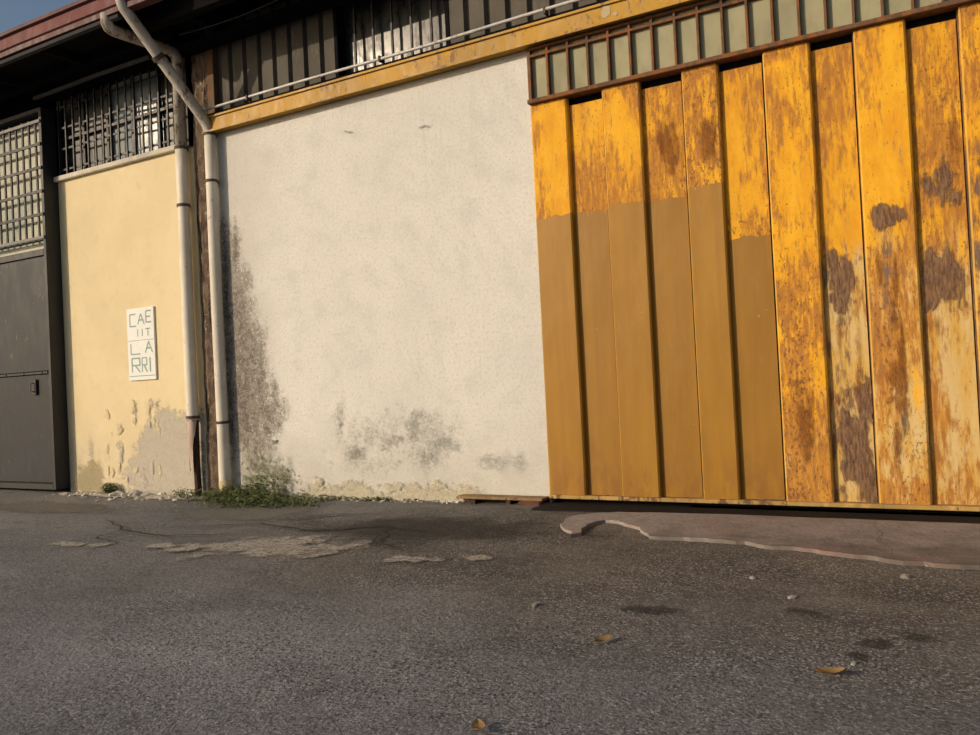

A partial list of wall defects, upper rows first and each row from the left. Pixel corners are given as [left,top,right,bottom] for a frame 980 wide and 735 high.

corrosion [657,122,677,172]
corrosion [697,119,714,158]
corrosion [919,121,962,208]
damp [220,224,285,459]
corrosion [825,248,854,348]
corrosion [922,246,966,327]
peeling [104,398,208,495]
corrosion [835,344,878,503]